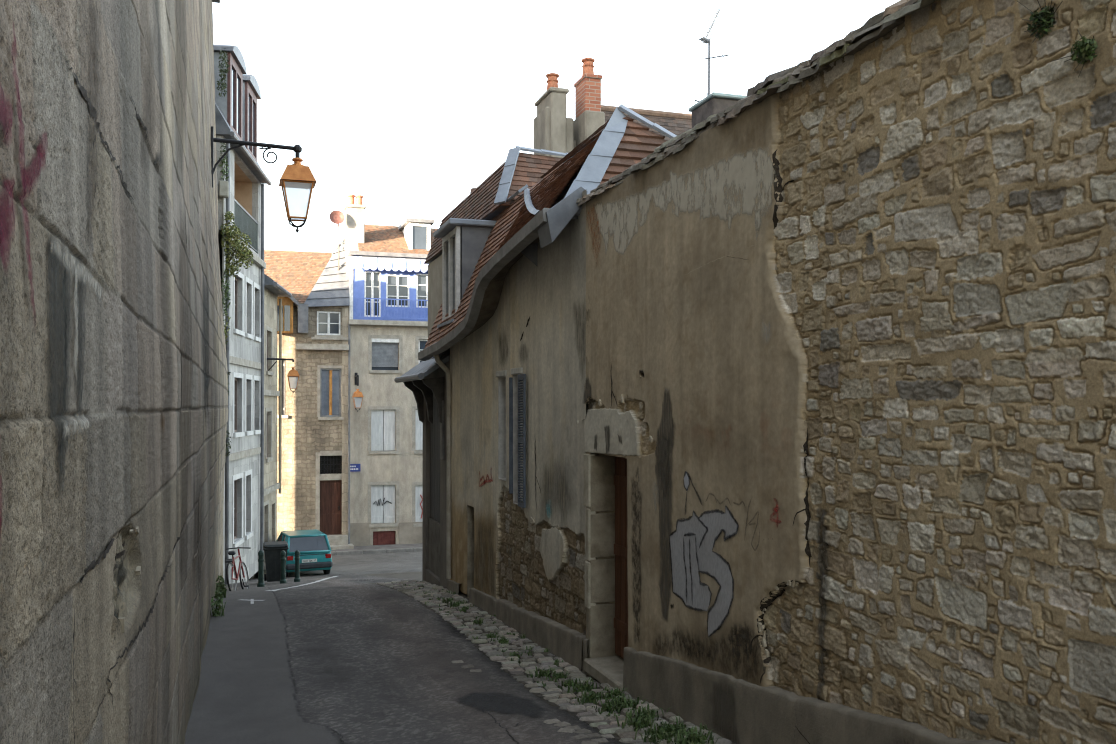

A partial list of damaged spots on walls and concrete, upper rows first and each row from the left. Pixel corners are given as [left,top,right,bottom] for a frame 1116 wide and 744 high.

spalling [586,395,657,457]
spalling [495,485,587,640]
spalling [757,571,821,698]